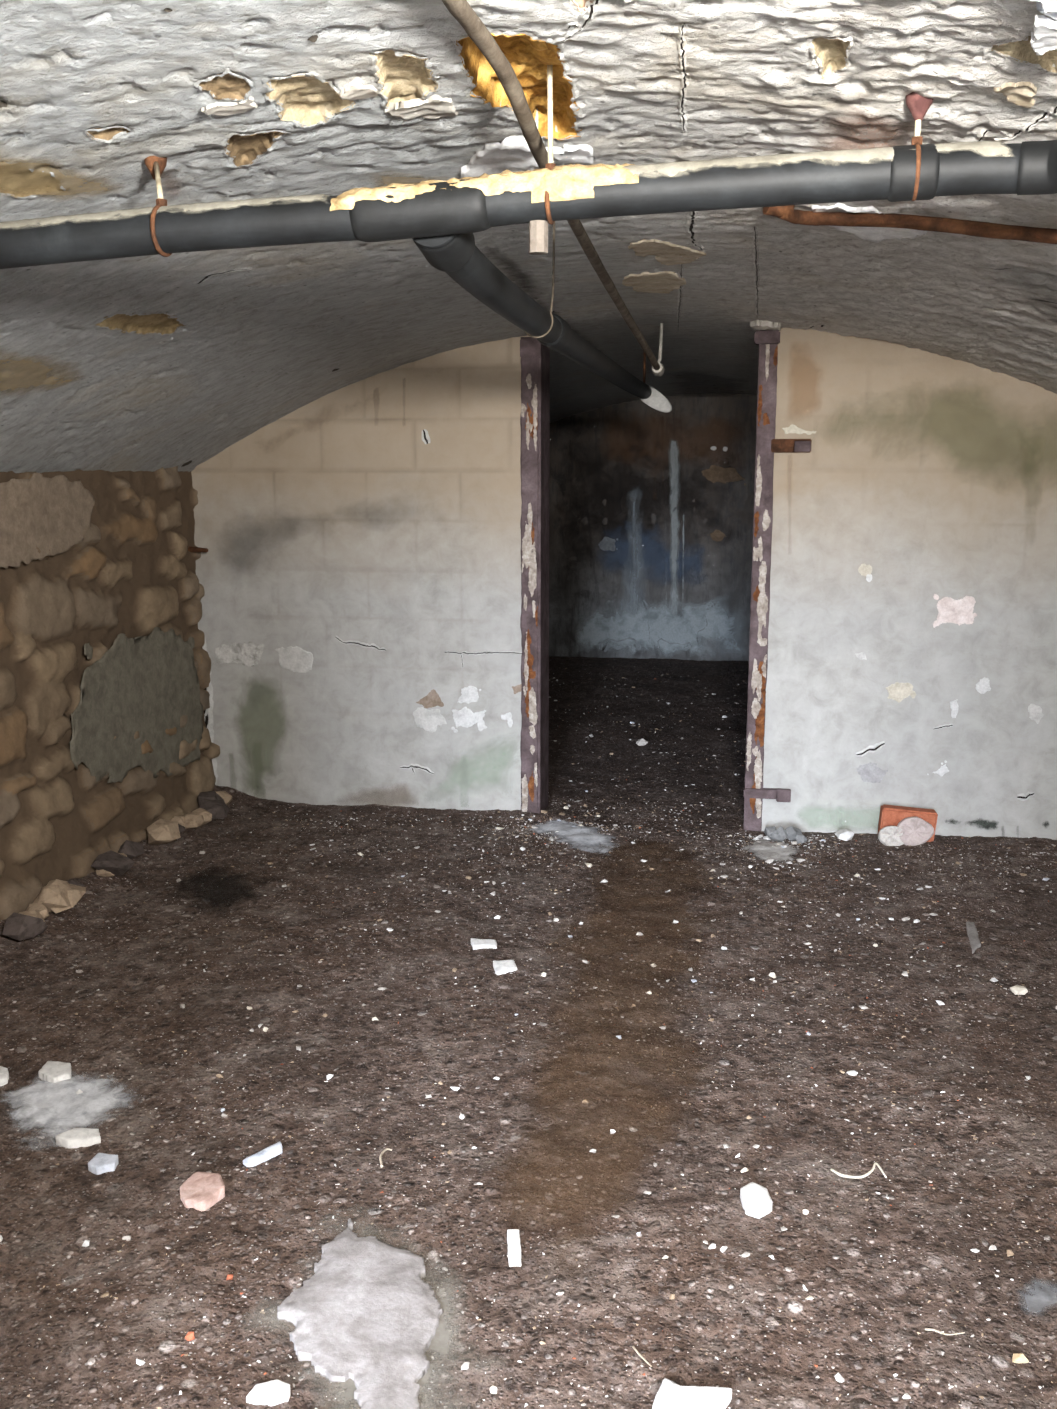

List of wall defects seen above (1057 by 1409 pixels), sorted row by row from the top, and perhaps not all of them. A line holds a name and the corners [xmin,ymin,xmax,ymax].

flaking render [193,28,594,179]
crack [552,0,601,44]
flaking render [983,0,1057,108]
damp [0,161,112,196]
rust [525,403,538,442]
rust [757,385,770,426]
damp [566,441,741,654]
peeling [413,502,538,812]
rust [523,606,538,718]
peeling [933,594,977,628]
rust [750,661,766,814]